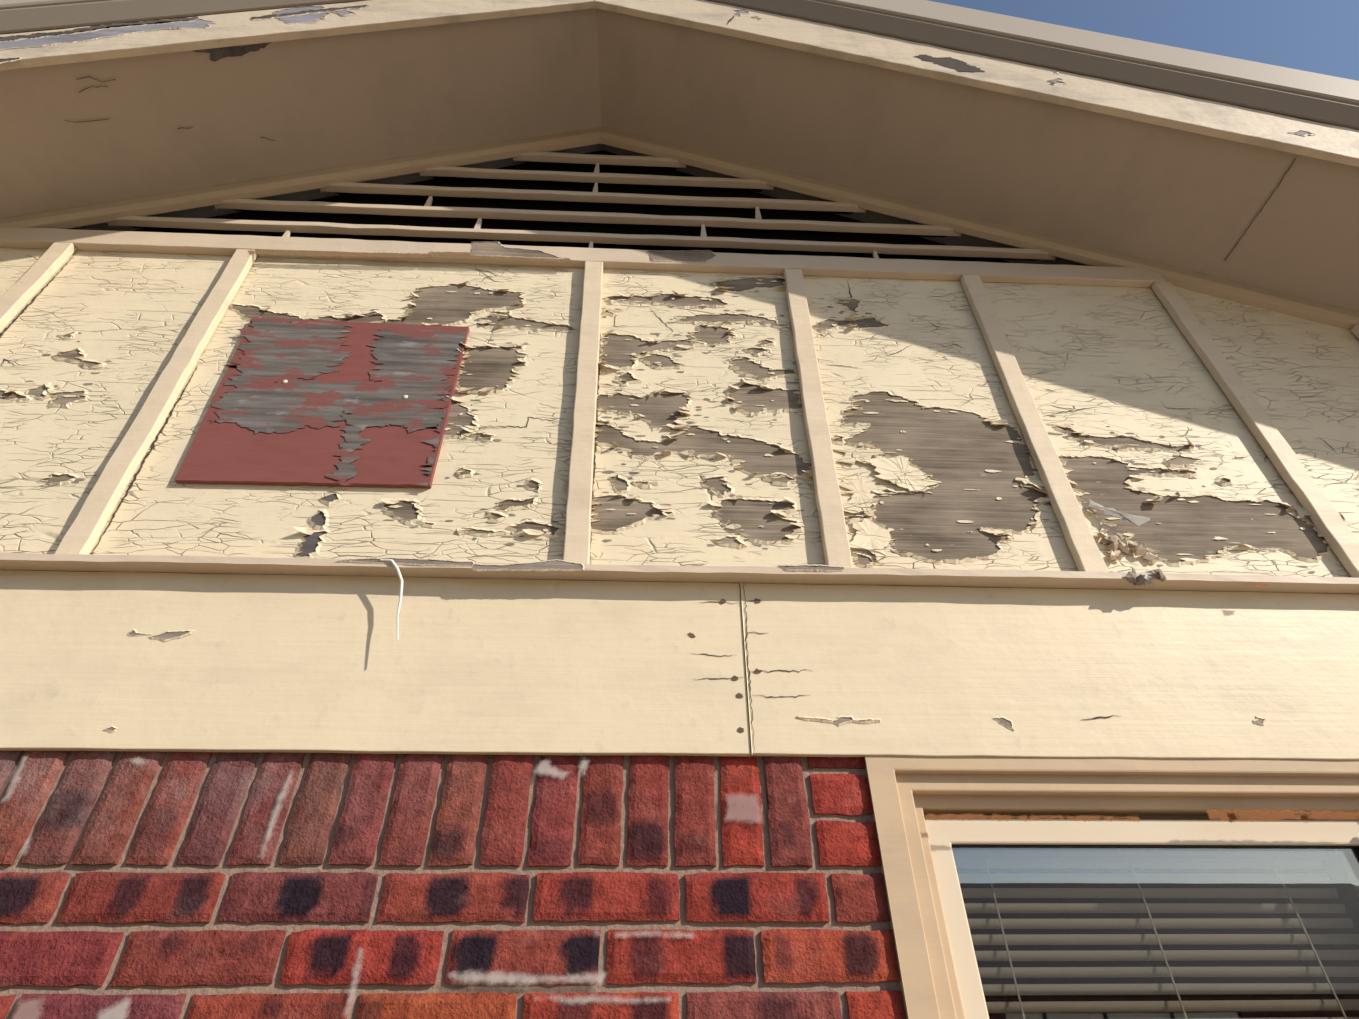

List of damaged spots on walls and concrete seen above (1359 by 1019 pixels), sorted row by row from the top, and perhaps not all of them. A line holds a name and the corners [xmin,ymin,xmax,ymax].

peeling [0,17,215,64]
peeling [913,54,985,72]
crack [1224,158,1296,261]
crack [0,256,74,366]
peeling [812,297,891,335]
crack [91,367,197,555]
peeling [207,281,580,545]
peeling [337,557,585,572]
peeling [591,276,813,549]
peeling [778,390,1051,572]
peeling [1047,415,1331,573]
crack [692,582,811,749]